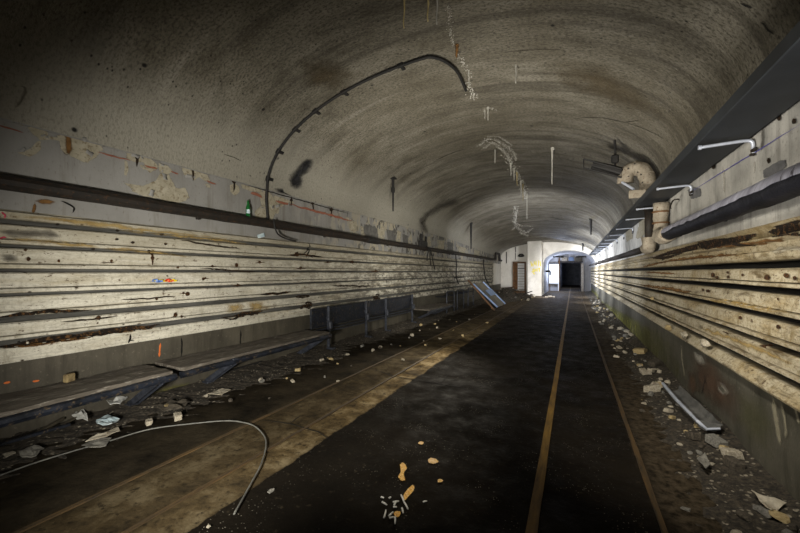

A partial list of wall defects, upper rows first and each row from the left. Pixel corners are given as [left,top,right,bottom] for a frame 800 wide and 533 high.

peeling [57,135,103,163]
peeling [125,153,189,203]
damp [477,136,533,236]
peeling [345,217,408,244]
corrosion [643,238,783,274]
corrosion [5,337,88,348]